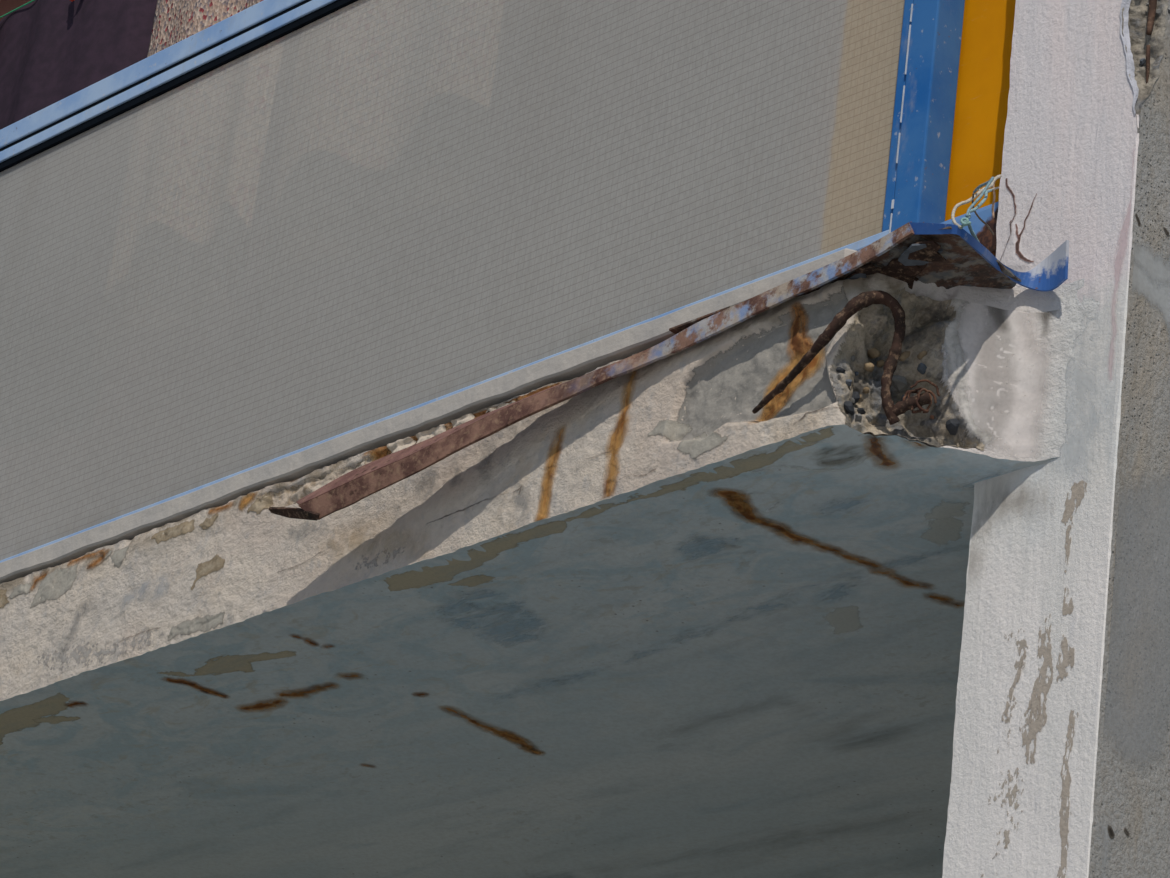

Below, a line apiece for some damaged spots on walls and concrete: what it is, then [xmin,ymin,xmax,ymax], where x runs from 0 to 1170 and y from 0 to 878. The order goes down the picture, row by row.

crack [1000,178,1037,262]
rust [759,305,823,422]
peeling [191,554,225,590]
spalling [247,455,375,514]
rust [536,429,563,521]
rust [605,371,636,498]
spalling [384,288,991,591]
rust [714,490,962,607]
peeling [1061,480,1087,573]
rust [239,674,360,711]
peeling [988,588,1074,859]
peeling [1057,710,1078,878]